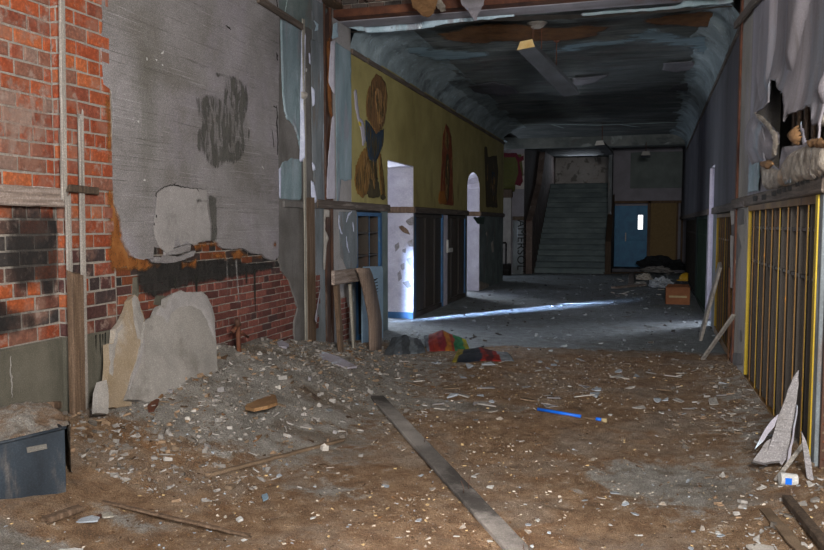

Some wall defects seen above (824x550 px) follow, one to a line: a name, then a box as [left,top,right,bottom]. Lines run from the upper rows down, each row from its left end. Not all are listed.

peeling [349,0,514,33]
peeling [408,47,489,61]
peeling [555,29,707,54]
peeling [582,0,733,16]
damp [196,77,250,167]
peeling [279,0,354,329]
peeling [354,90,366,146]
flaking render [748,107,824,193]
flaking render [148,244,196,263]
peeling [395,216,413,288]
peeling [730,209,745,288]